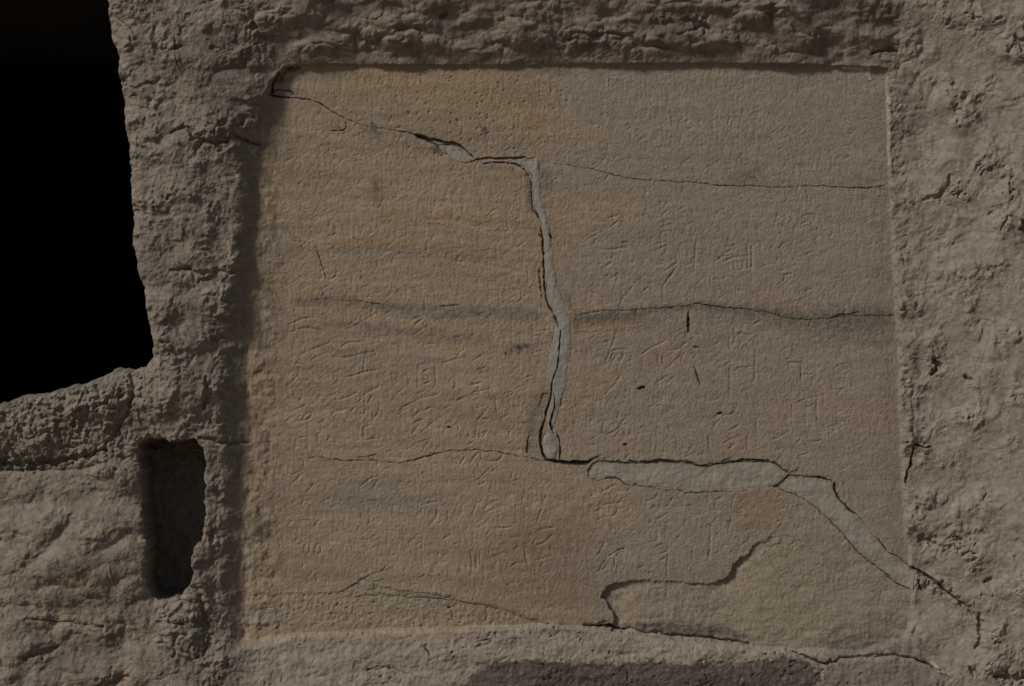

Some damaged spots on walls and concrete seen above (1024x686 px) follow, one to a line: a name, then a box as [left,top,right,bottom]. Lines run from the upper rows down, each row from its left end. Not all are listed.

crack [268,66,963,604]